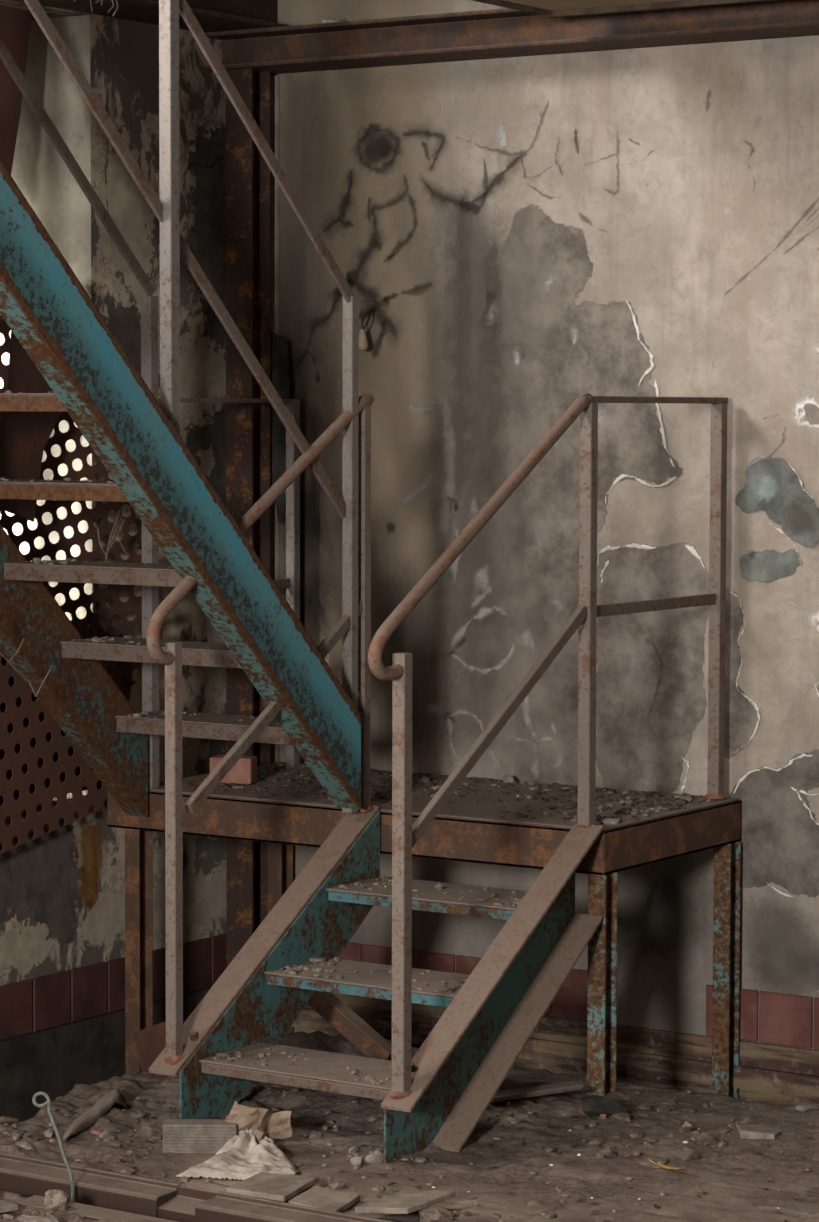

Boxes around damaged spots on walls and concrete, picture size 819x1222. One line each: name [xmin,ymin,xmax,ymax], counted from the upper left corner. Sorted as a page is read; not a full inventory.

corrosion [0,5,31,175]
corrosion [0,499,37,522]
corrosion [7,330,53,393]
corrosion [0,411,61,480]
peeling [502,204,683,786]
spalling [735,457,819,563]
damp [794,397,819,428]
corrosion [0,656,102,806]
peeling [596,543,709,794]
peeling [724,589,760,759]
peeling [183,860,226,932]
peeling [729,750,819,898]